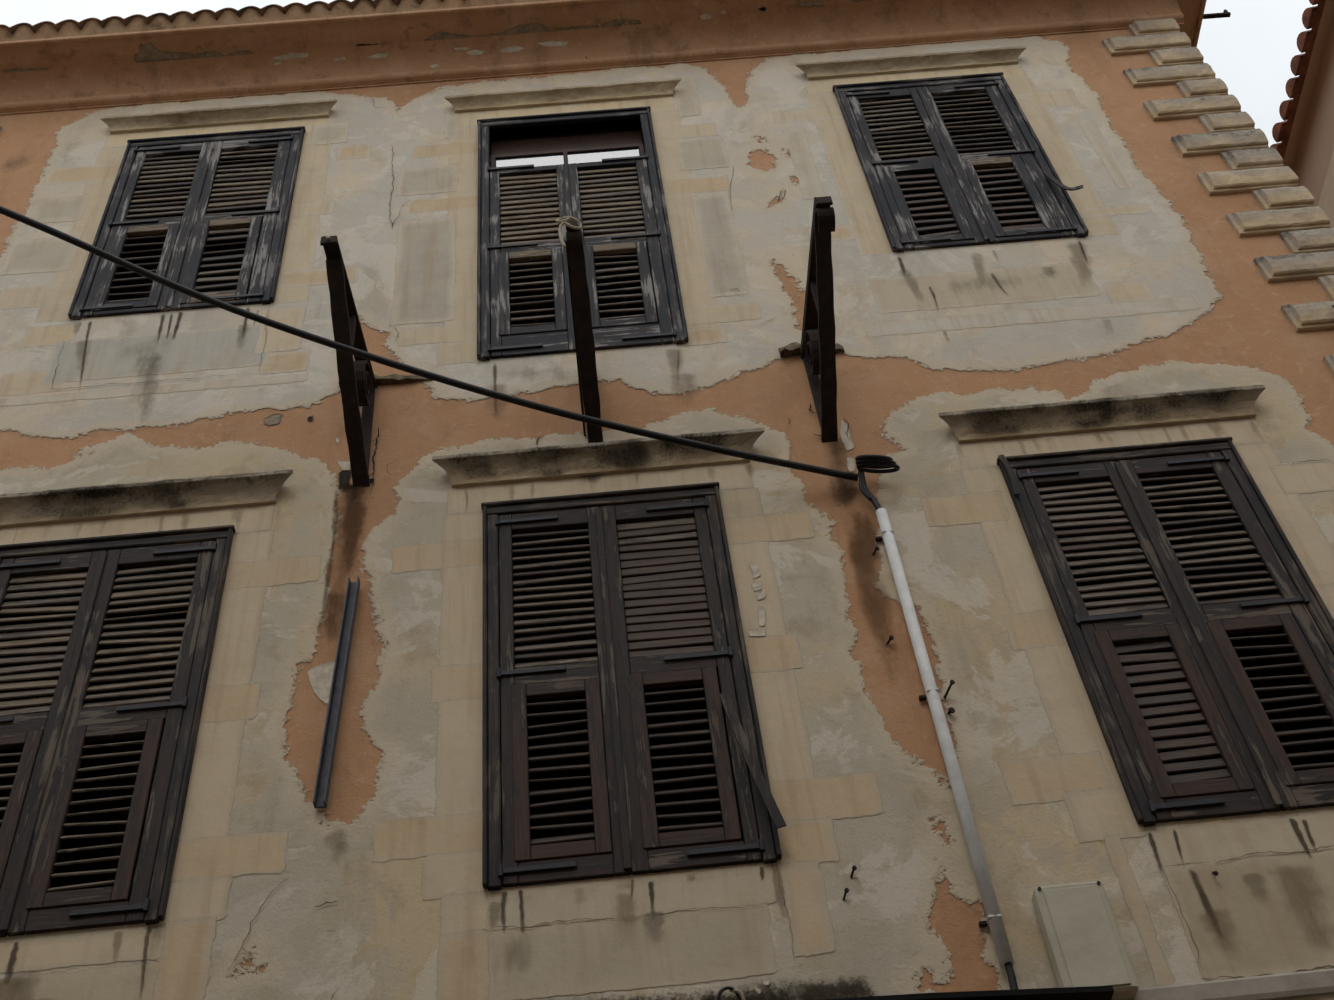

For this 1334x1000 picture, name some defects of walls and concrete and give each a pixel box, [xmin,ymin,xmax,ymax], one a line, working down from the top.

peeling [0,36,1224,403]
damp [158,312,182,338]
corrosion [344,489,363,553]
peeling [0,284,588,1000]
peeling [502,360,1334,1000]
damp [1148,833,1160,866]
damp [1290,819,1314,854]
damp [501,890,524,927]
damp [1191,872,1217,926]
damp [6,942,18,980]
damp [142,928,151,982]
mould [601,980,872,1000]